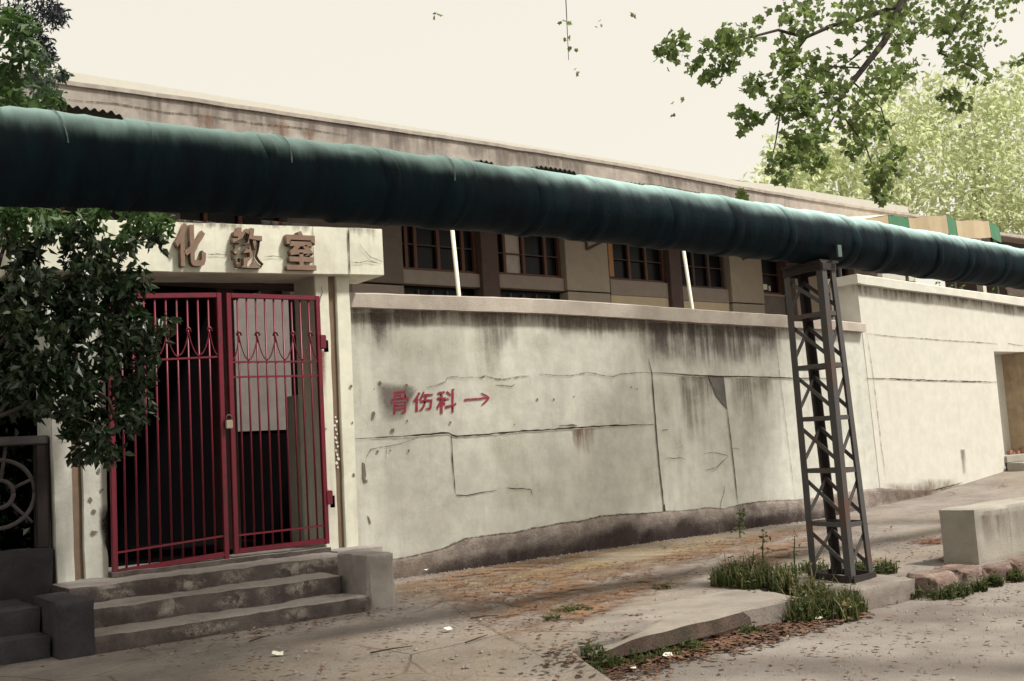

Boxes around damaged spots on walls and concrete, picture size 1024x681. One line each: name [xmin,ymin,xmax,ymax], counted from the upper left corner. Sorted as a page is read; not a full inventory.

water stain [353,308,429,328]
water stain [462,312,521,343]
water stain [538,315,775,348]
water stain [680,376,711,414]
crack [357,369,800,559]
water stain [403,510,839,574]